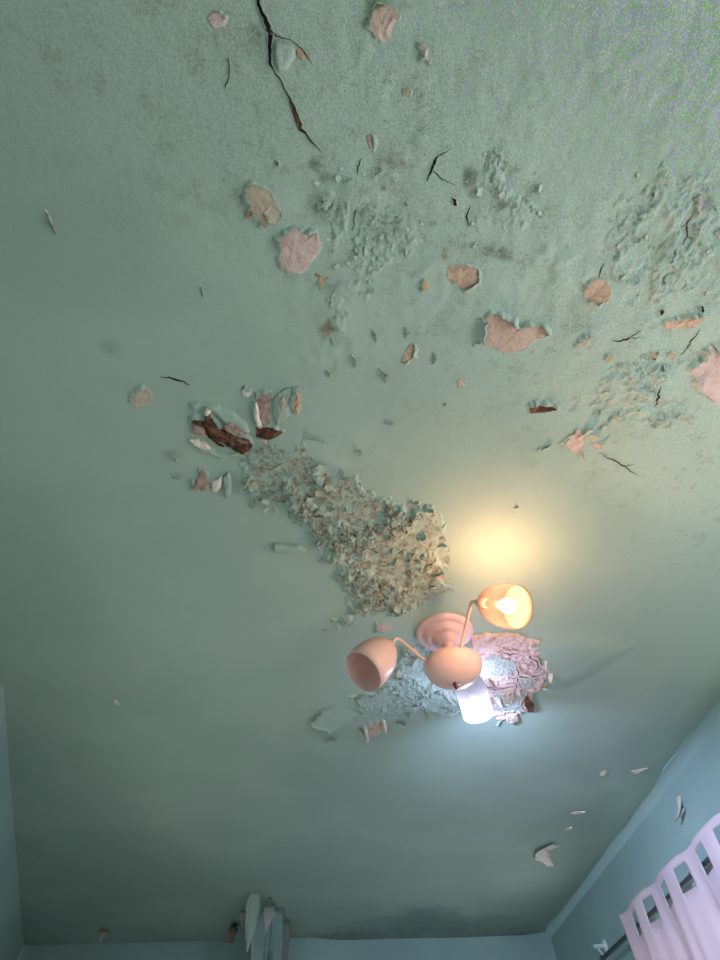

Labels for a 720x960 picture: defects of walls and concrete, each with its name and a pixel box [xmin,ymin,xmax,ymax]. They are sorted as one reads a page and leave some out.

crack [254,0,323,153]
crack [425,147,456,186]
peeling [239,133,438,346]
peeling [582,159,720,330]
crack [160,375,190,386]
spalling [472,309,552,355]
peeling [538,350,694,461]
spalling [687,342,720,406]
peeling [165,384,456,634]
crack [599,451,637,476]
peeling [311,643,463,743]
spalling [463,632,553,725]